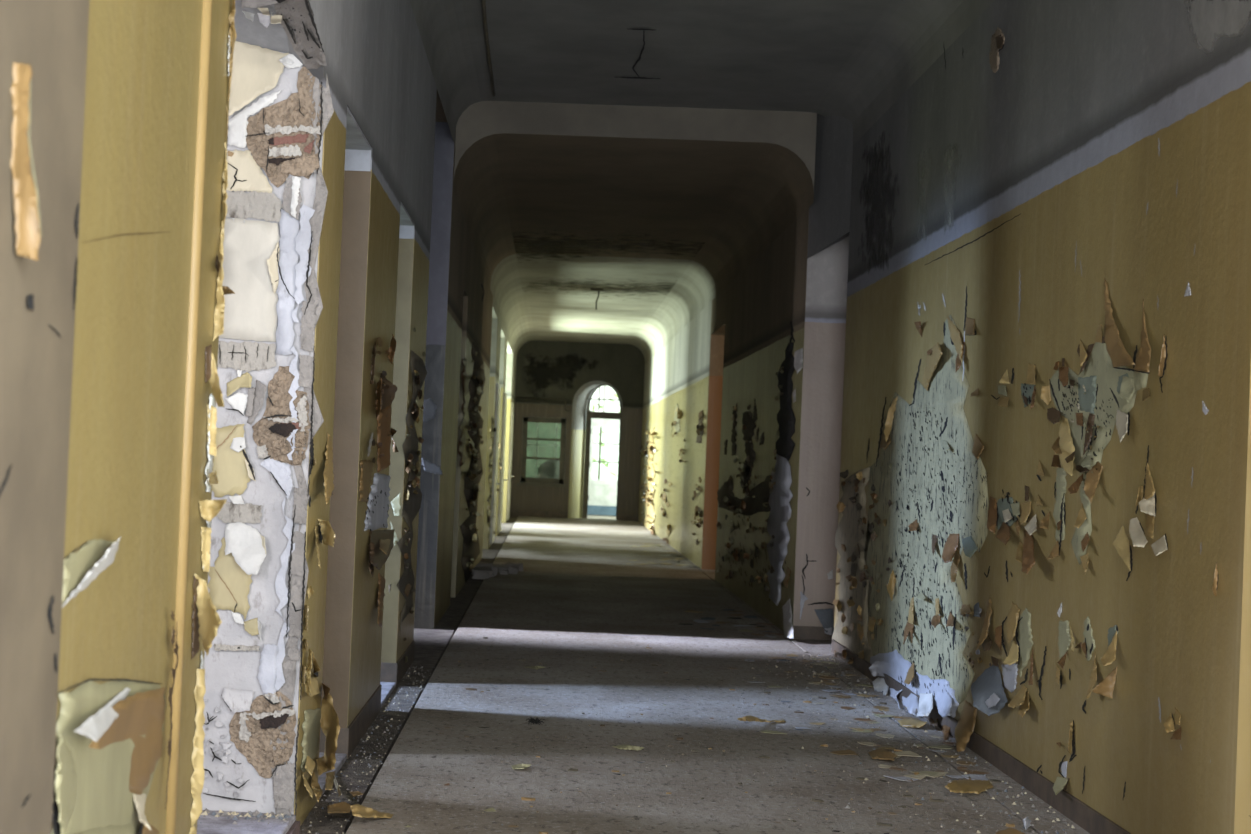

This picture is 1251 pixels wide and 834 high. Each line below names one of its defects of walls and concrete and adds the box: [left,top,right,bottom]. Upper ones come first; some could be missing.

peeling [10,62,42,261]
peeling [62,537,121,607]
spalling [189,0,363,834]
peeling [359,334,443,641]
peeling [458,343,502,583]
peeling [639,404,705,544]
peeling [691,271,1168,752]
peeling [51,679,166,834]
peeling [1053,603,1118,795]